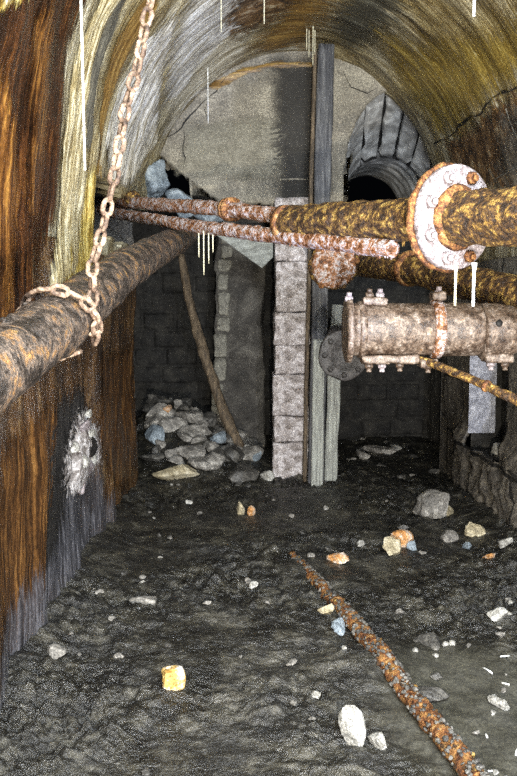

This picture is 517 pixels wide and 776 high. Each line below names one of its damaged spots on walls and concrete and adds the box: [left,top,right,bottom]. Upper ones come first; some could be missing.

water stain [50,0,317,286]
crack [434,87,517,144]
water stain [0,378,116,709]